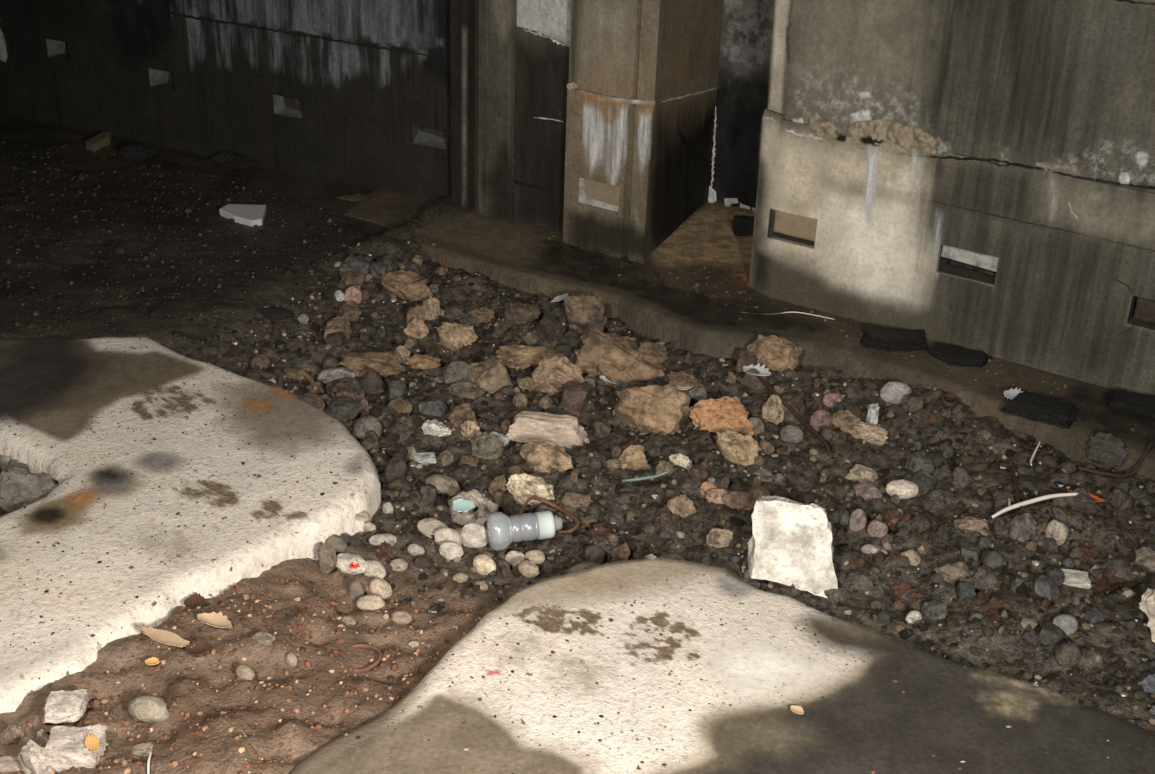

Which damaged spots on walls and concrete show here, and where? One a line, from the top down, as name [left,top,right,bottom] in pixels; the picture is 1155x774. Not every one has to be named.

leakage [581,91,654,185]
crack [785,0,793,64]
spalling [793,92,951,155]
leakage [770,0,1070,149]
crack [1117,0,1155,8]
leakage [756,122,942,343]
crack [848,147,1155,252]
leakage [953,171,1123,375]